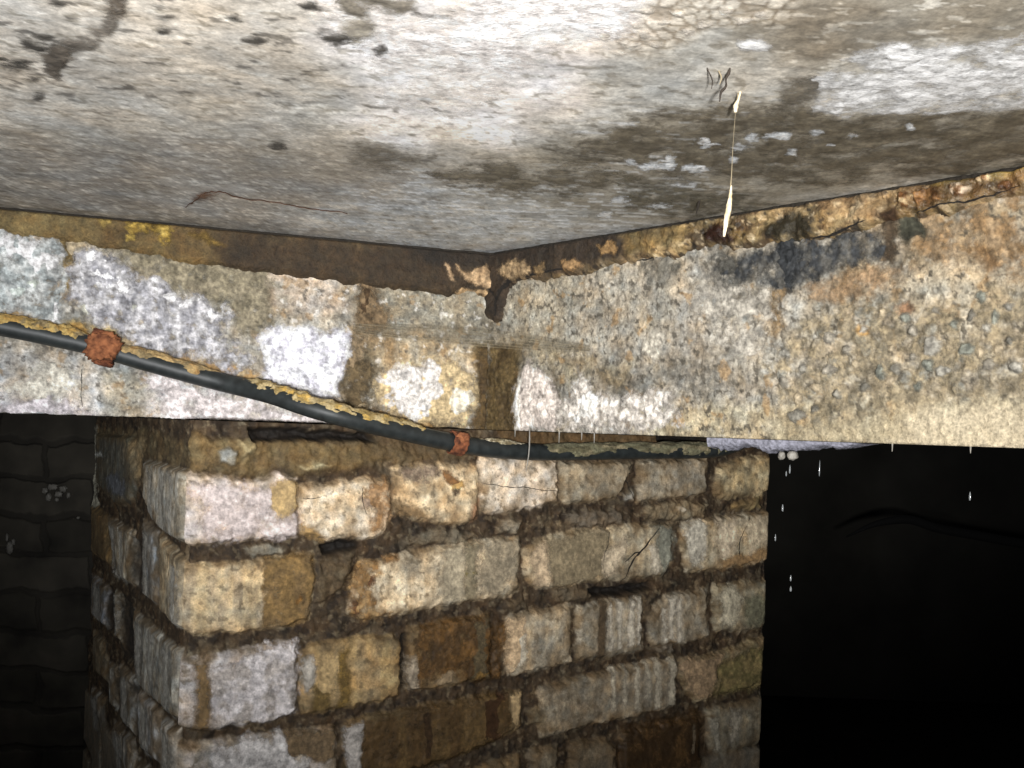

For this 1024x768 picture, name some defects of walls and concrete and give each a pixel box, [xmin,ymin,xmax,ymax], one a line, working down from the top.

leakage [0,0,125,101]
leakage [241,37,266,45]
leakage [298,0,638,107]
leakage [350,142,416,171]
leakage [432,38,1024,356]
spalling [896,174,1010,209]
crack [917,185,1020,214]
crack [809,220,865,239]
peeling [597,240,617,255]
peeling [445,259,544,297]
peeling [561,259,581,272]
crack [602,522,661,581]